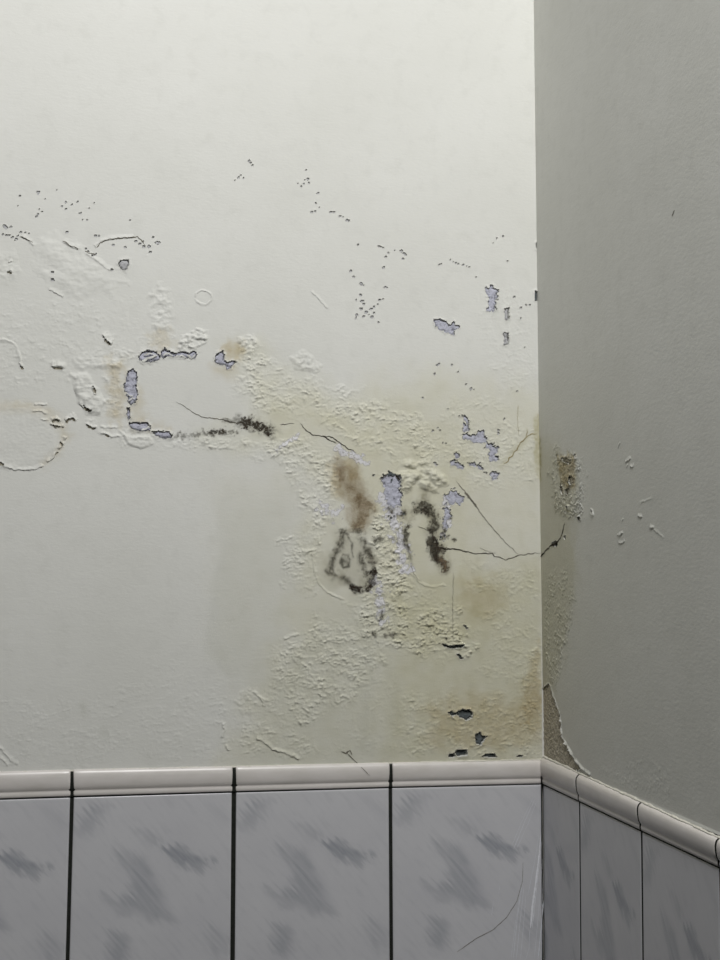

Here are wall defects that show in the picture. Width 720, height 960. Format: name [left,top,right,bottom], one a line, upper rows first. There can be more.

crack [282,423,356,453]
crack [506,416,534,463]
peeling [42,258,594,772]
damp [314,492,456,636]
crack [418,481,565,641]